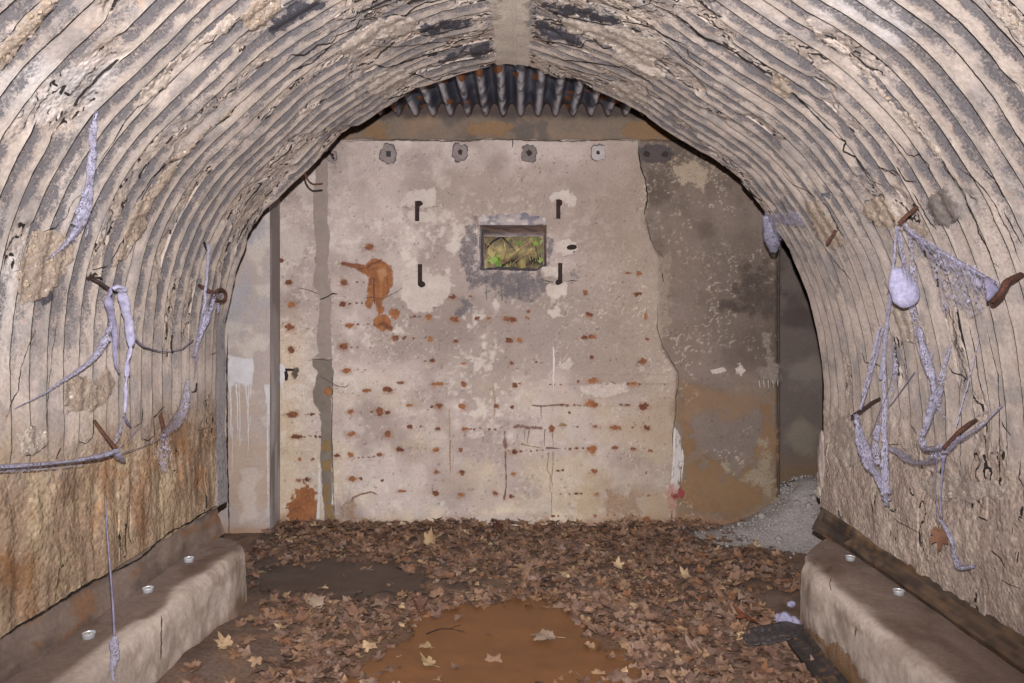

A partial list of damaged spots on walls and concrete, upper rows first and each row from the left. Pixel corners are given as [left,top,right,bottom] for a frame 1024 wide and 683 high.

crack [103,16,241,156]
spalling [340,15,419,57]
spalling [561,18,670,109]
crack [92,106,236,270]
water stain [666,152,716,194]
crack [533,2,1023,283]
water stain [228,355,305,515]
rust [281,323,297,355]
rust [328,242,435,352]
spalling [479,224,578,319]
water stain [602,251,788,525]
rust [283,477,325,525]